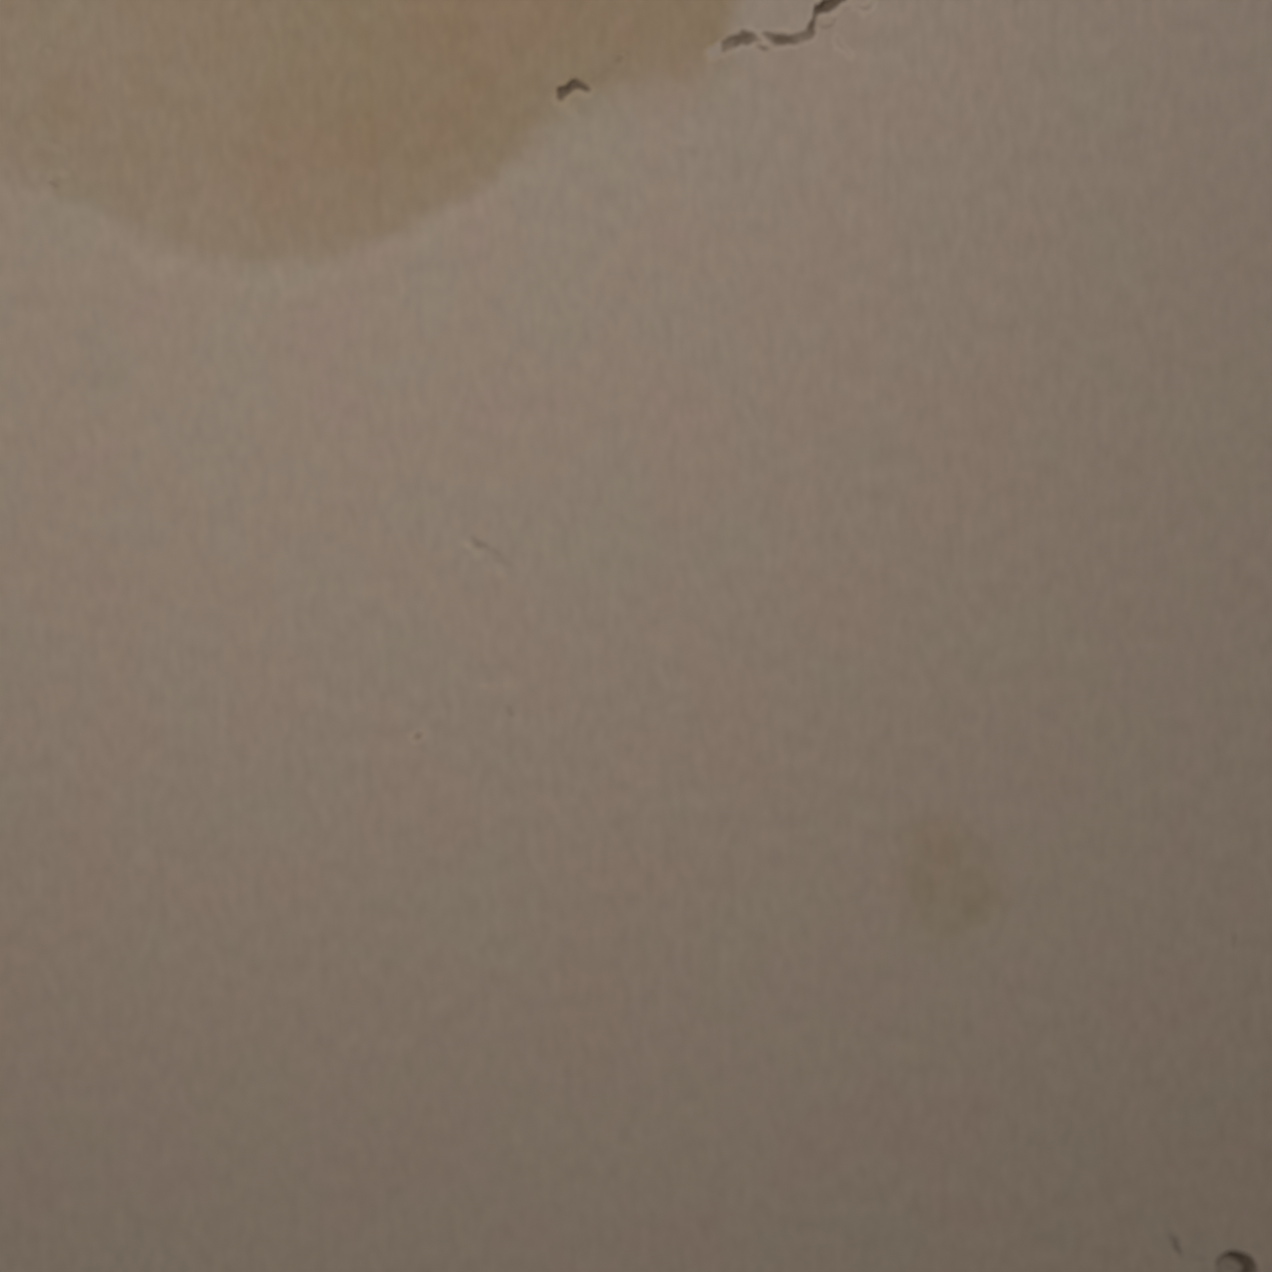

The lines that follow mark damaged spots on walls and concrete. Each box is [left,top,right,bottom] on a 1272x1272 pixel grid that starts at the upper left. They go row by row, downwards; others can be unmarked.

leakage [0,0,750,313]
crack [703,0,879,63]